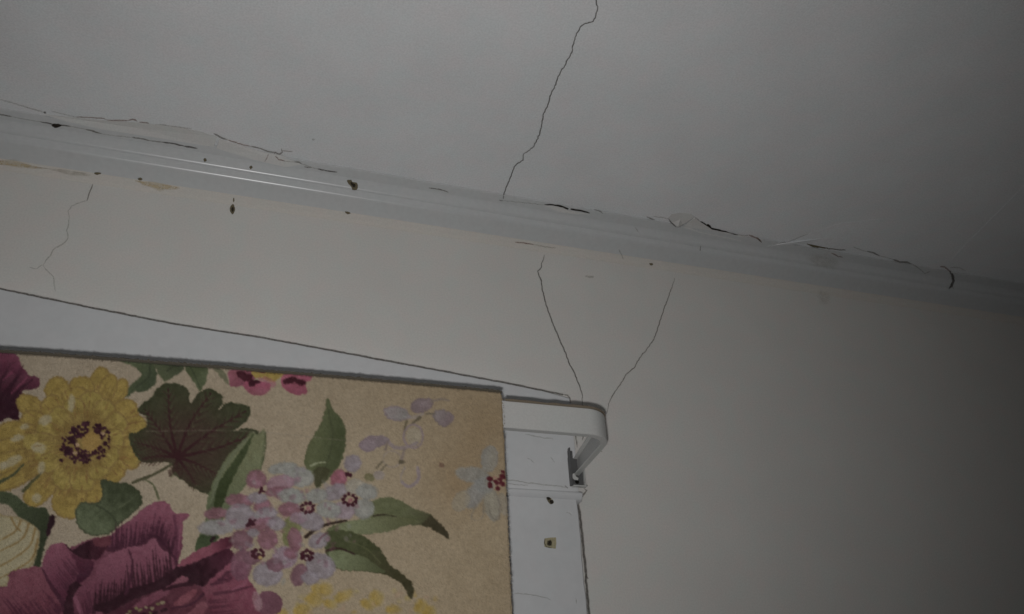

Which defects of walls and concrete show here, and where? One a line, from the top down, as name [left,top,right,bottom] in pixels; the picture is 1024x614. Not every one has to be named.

crack [500,0,598,201]